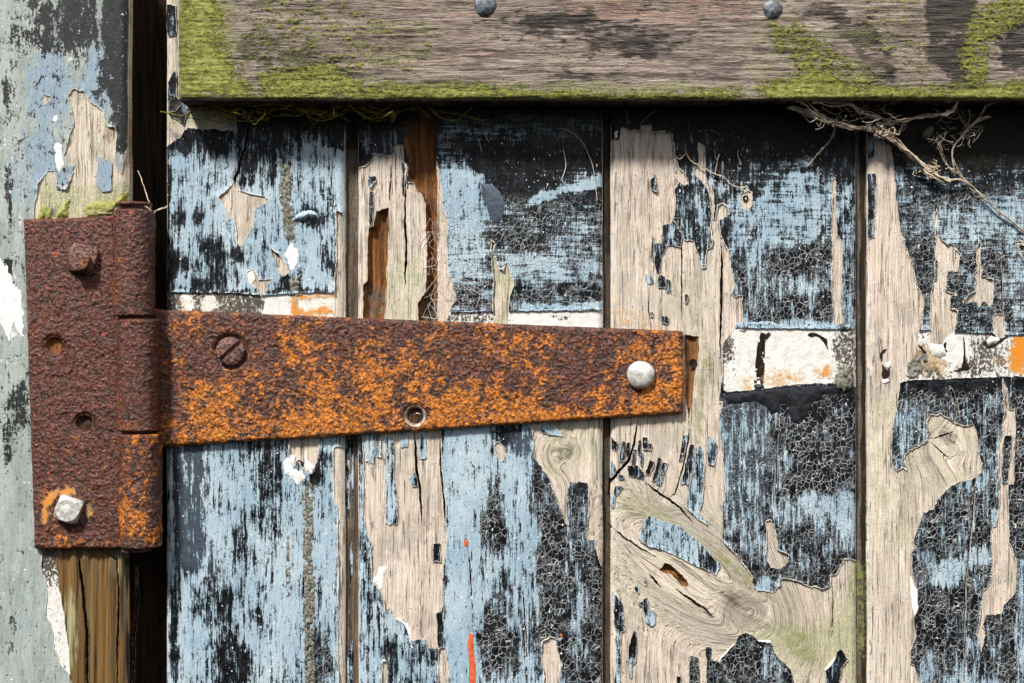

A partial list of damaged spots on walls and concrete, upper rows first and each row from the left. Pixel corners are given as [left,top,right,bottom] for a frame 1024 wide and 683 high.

peeling [34,89,129,219]
peeling [167,211,345,317]
corrosion [289,294,335,316]
peeling [283,437,319,484]
crack [607,421,638,496]
peeling [358,125,1024,683]
crack [930,386,959,460]
corrosion [42,487,75,524]
peeling [333,446,346,683]
crack [468,551,487,621]
crack [517,589,527,657]
crack [963,490,975,672]